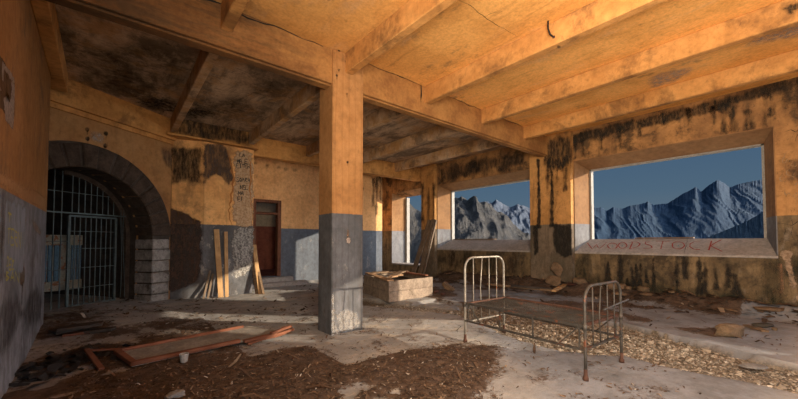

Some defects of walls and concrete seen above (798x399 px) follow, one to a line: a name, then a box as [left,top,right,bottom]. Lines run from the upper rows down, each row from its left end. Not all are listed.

crack [241,14,322,46]
water stain [177,101,253,184]
water stain [573,78,798,158]
peeling [227,150,254,278]
water stain [421,153,524,222]
water stain [533,159,665,293]
water stain [674,256,747,299]
spalling [780,250,798,300]